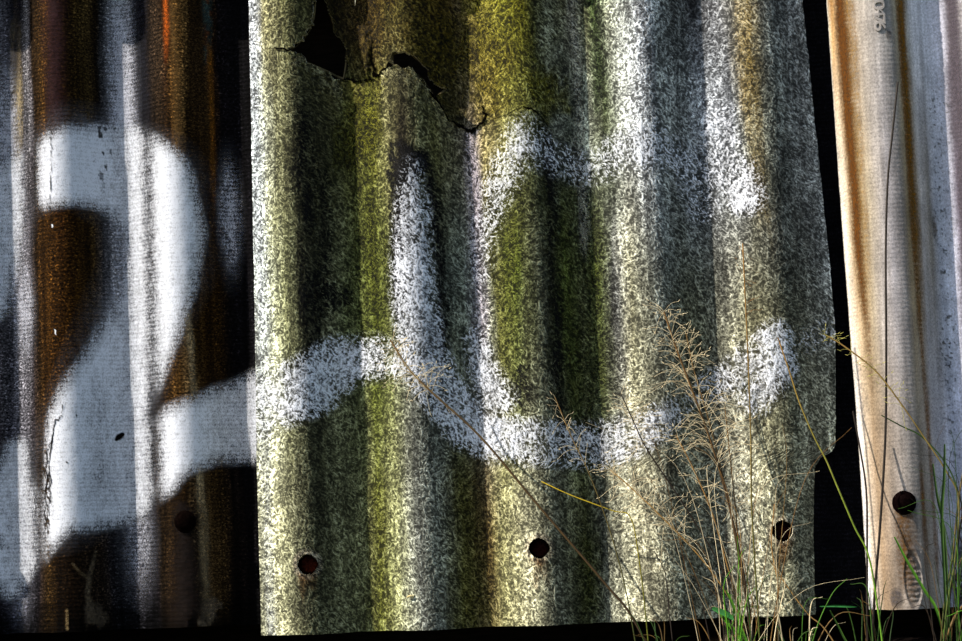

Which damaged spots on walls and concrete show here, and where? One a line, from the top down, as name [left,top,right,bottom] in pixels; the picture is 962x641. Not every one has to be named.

corrosion [163,0,180,161]
water stain [248,1,265,335]
water stain [291,109,353,334]
crack [343,41,393,83]
water stain [352,139,450,381]
water stain [467,133,483,336]
water stain [543,122,618,406]
corrosion [835,0,870,332]
corrosion [896,0,924,358]
water stain [511,364,538,411]